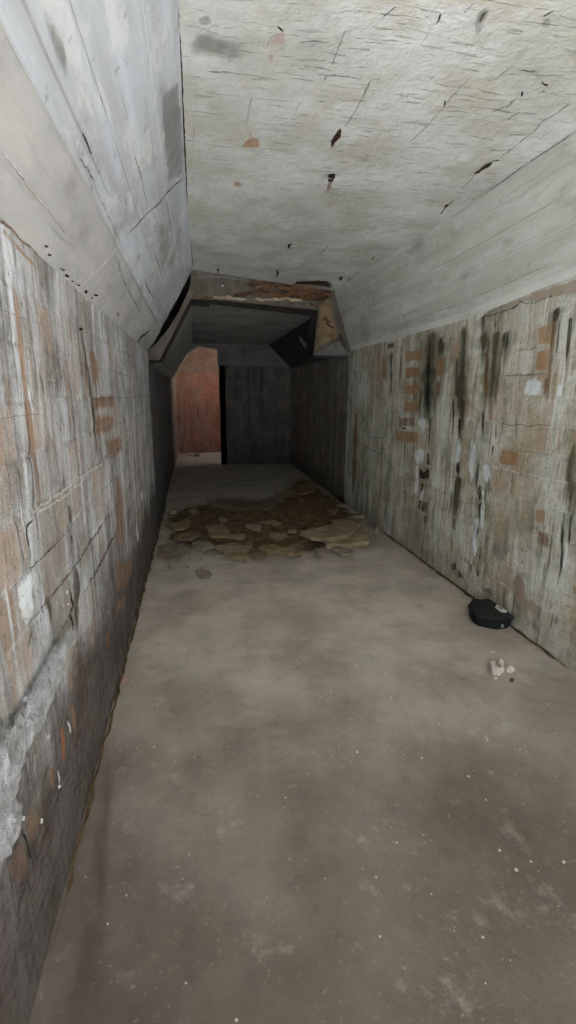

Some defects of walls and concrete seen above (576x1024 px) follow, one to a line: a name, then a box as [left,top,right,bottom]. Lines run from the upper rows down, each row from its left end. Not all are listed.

crack [68,4,193,342]
crack [300,30,372,125]
crack [412,66,512,141]
crack [489,92,573,187]
spalling [192,271,351,309]
leakage [546,307,572,364]
leakage [414,311,496,533]
efflorescence [523,378,542,396]
crack [12,444,122,631]
leakage [382,531,476,599]
leakage [557,443,576,585]
leakage [510,624,568,668]